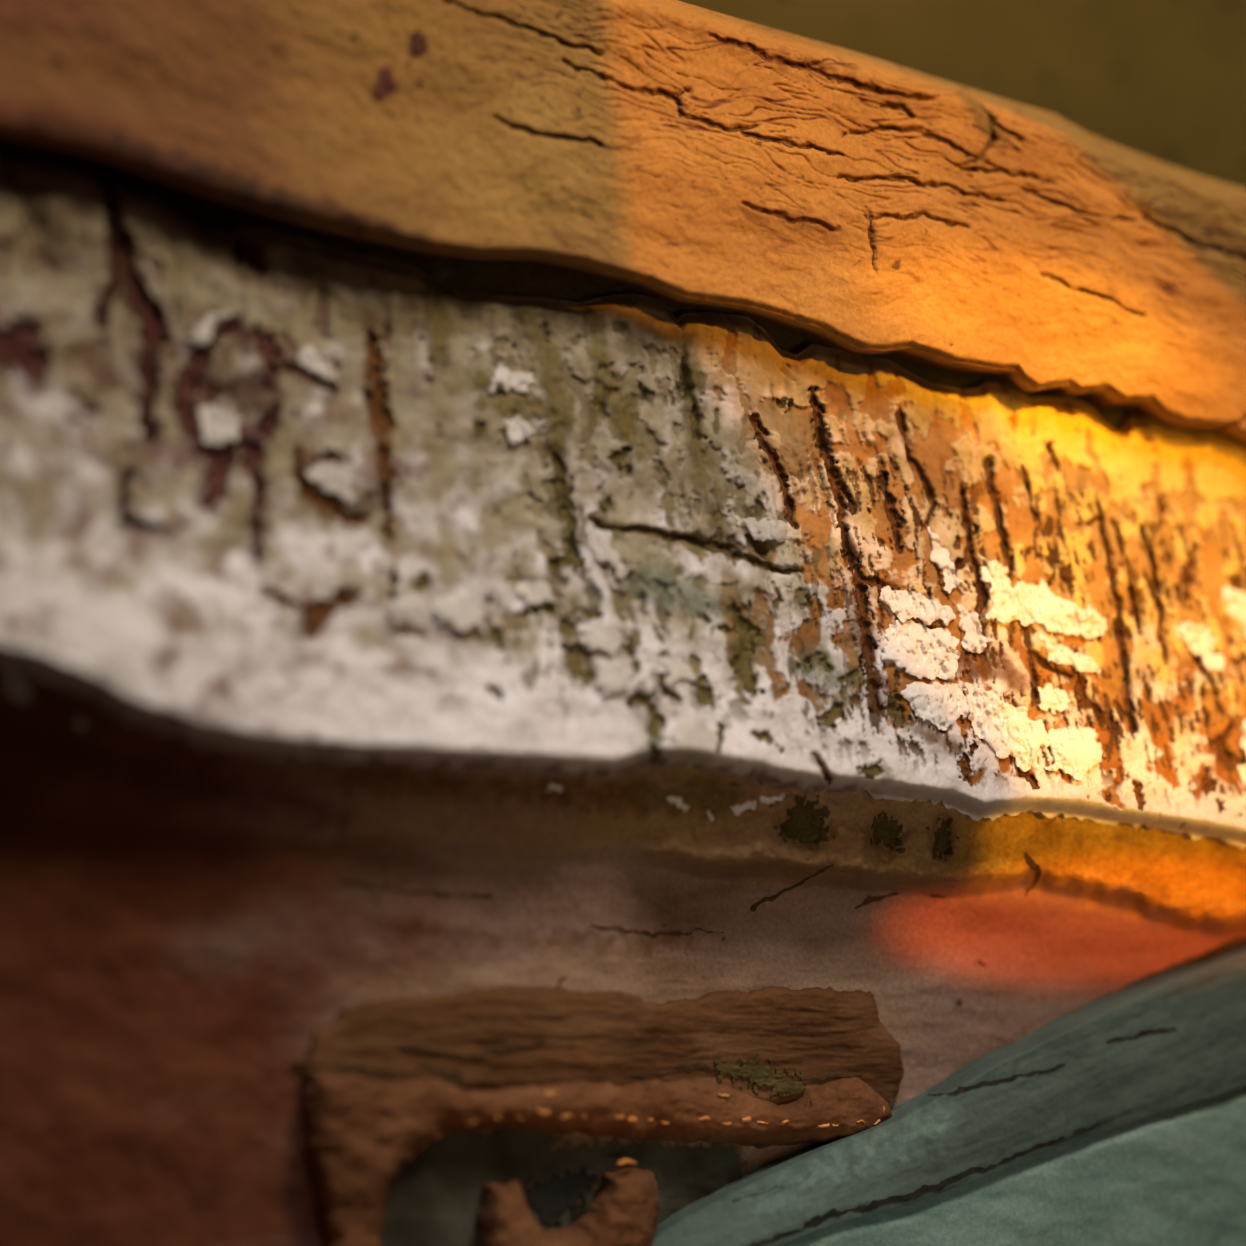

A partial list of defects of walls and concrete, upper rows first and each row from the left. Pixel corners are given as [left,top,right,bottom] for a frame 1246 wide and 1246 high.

crack [444,1,1246,266]
crack [94,163,175,535]
crack [1041,275,1144,318]
spalling [171,310,338,563]
peeling [727,513,788,542]
peeling [515,446,725,767]
rust [957,650,1025,688]
peeling [879,526,1113,789]
peeling [1173,620,1246,671]
rust [915,720,960,753]
crack [927,1063,1065,1096]
crack [750,1123,1100,1246]